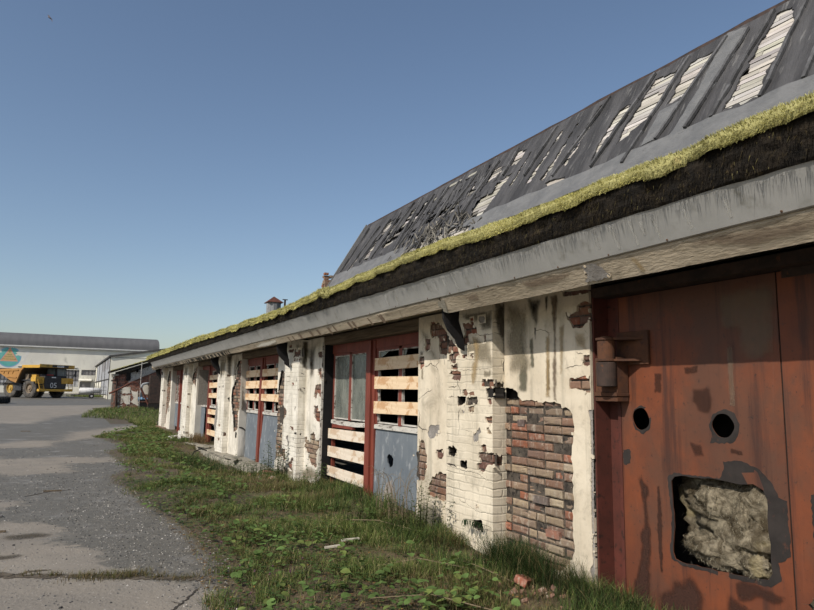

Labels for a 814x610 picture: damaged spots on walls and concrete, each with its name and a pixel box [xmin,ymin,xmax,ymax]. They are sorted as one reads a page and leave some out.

spalling [564,264,611,328]
spalling [418,318,486,381]
leakage [466,296,557,393]
spalling [213,360,243,441]
spalling [274,378,304,470]
spalling [305,433,319,468]
spalling [313,350,325,423]
spalling [413,425,467,503]
spalling [458,390,475,413]
spalling [473,378,575,570]
crack [0,569,211,610]